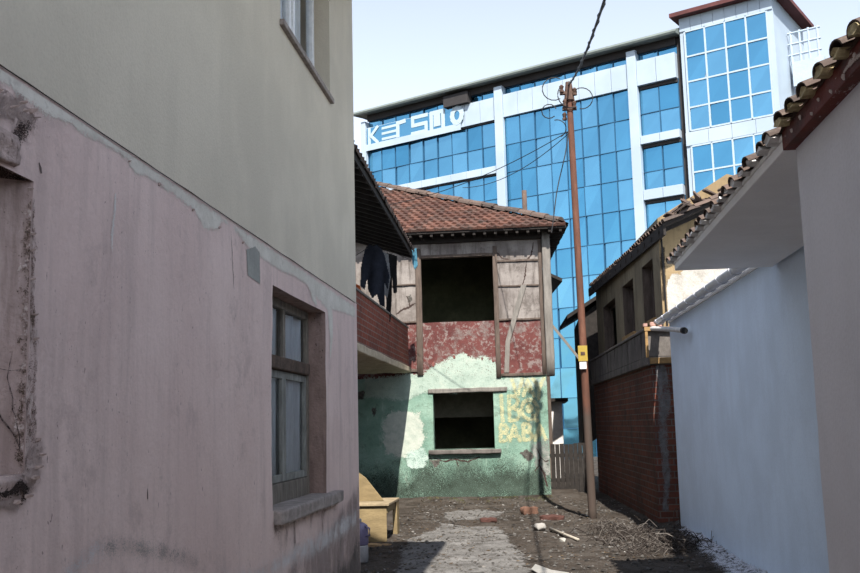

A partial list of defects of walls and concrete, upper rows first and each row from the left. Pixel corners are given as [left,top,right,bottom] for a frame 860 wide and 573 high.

flaking render [0,69,355,318]
spalling [0,187,47,513]
leakage [214,485,360,573]
peeling [358,352,547,469]
leakage [359,443,551,498]
crack [535,448,549,487]